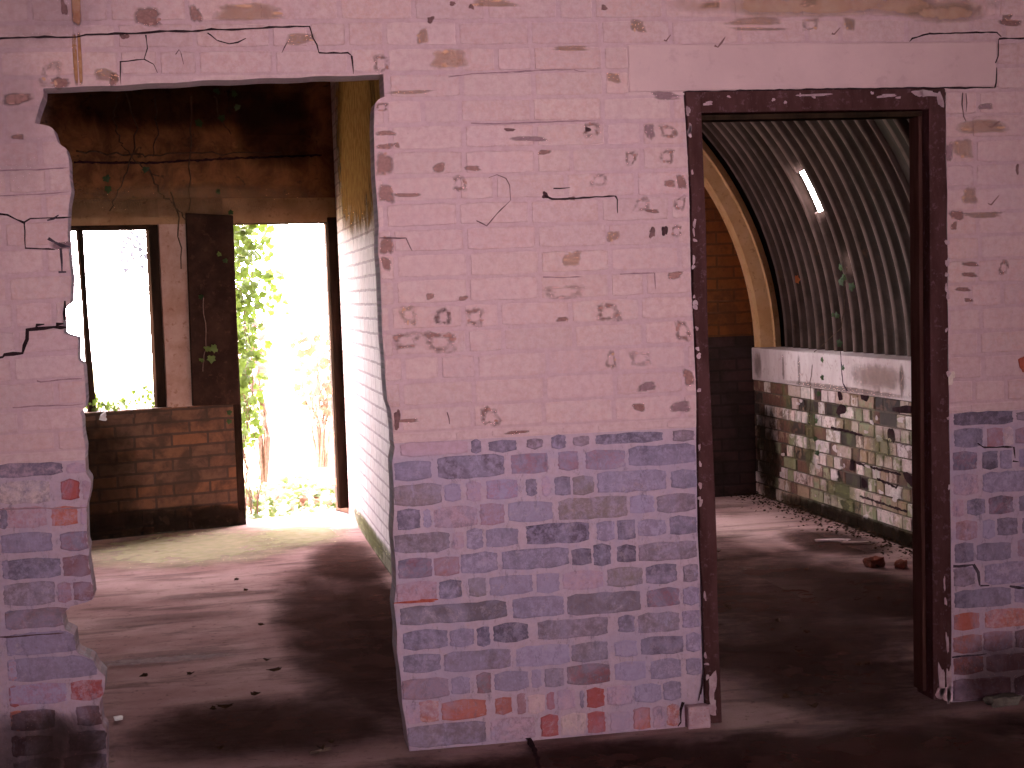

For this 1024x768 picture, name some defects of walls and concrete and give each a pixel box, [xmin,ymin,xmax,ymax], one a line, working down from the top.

crack [0,26,354,82]
crack [683,31,1024,121]
crack [0,156,266,273]
crack [476,175,511,226]
crack [544,187,618,213]
crack [0,301,68,359]
peeling [425,308,456,351]
water stain [798,361,903,396]